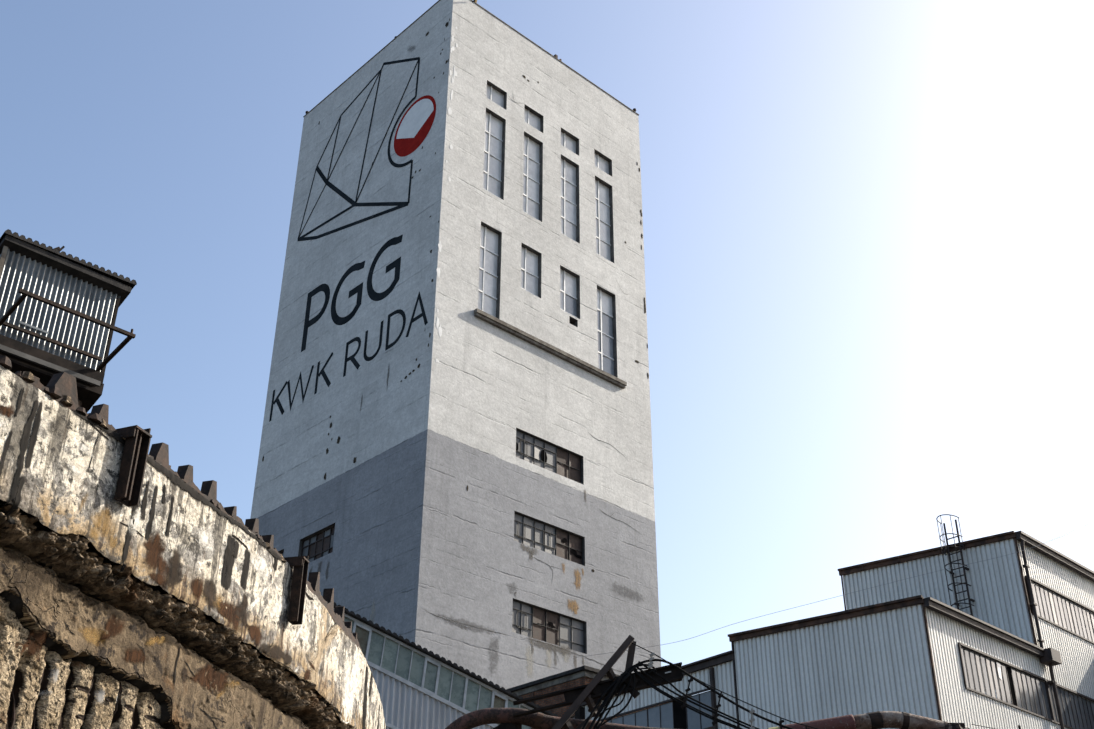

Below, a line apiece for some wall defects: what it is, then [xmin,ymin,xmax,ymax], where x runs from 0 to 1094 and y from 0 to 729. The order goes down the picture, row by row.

damp [0,388,60,530]
damp [73,410,125,445]
spalling [0,589,180,729]
crack [0,586,226,729]
damp [0,547,309,729]
rust [144,533,168,586]
damp [123,456,282,625]
peeling [193,528,213,551]
peeling [248,555,269,609]
peeling [270,597,285,618]
crack [316,697,342,714]
peeling [341,645,360,724]